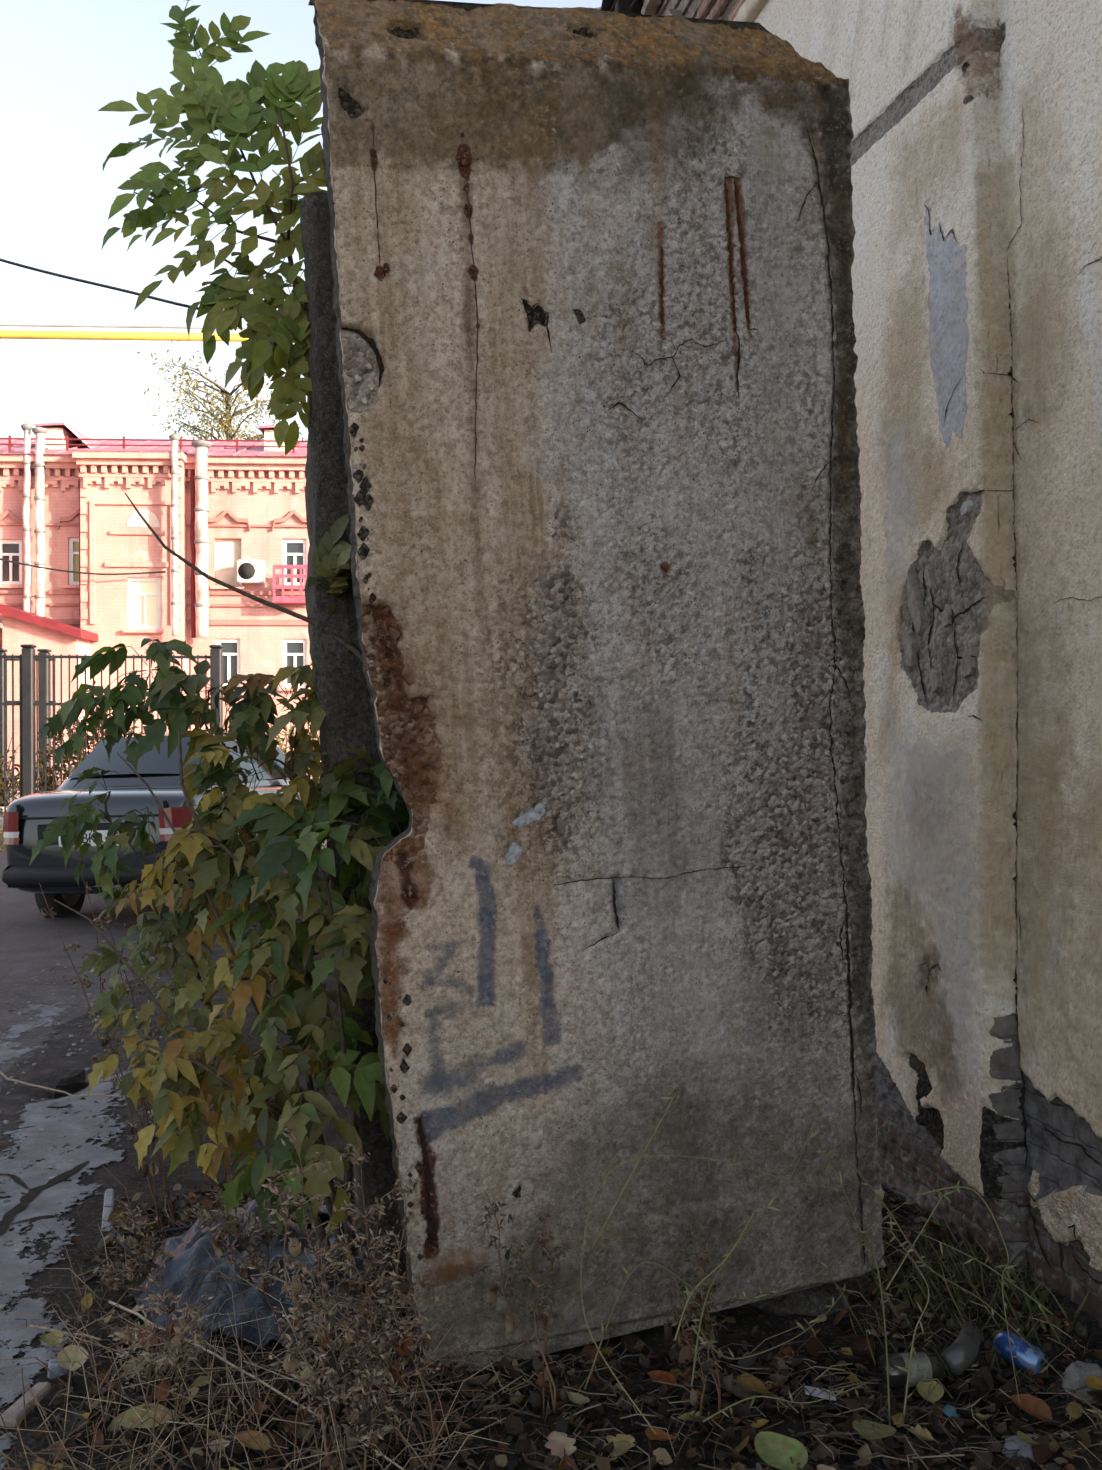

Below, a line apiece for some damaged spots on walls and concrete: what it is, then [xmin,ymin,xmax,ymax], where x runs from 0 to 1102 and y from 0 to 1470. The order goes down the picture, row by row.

spalling [850,10,1006,166]
corrosion [370,124,390,281]
corrosion [456,132,480,484]
spalling [521,299,552,352]
corrosion [657,222,665,339]
corrosion [724,176,758,397]
spalling [341,328,442,864]
corrosion [372,605,428,717]
spalling [897,491,1016,713]
corrosion [378,839,429,1058]
crack [552,866,745,950]
flaking render [874,1013,1102,1326]